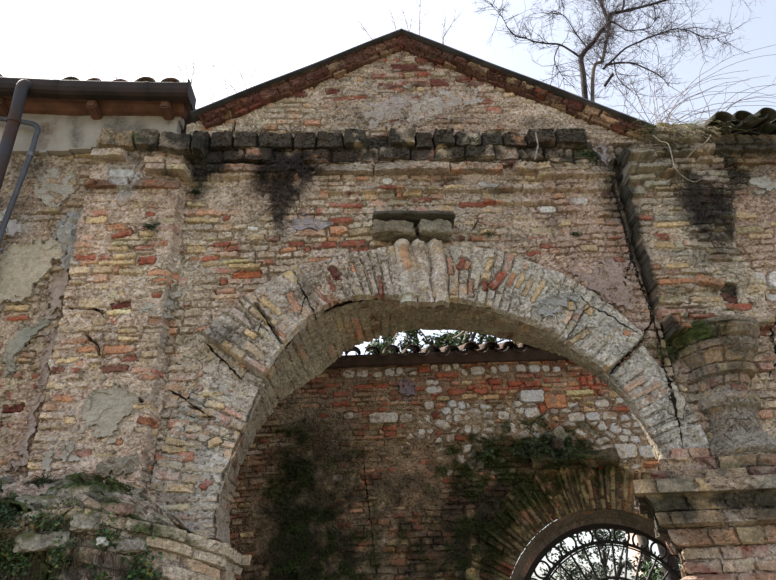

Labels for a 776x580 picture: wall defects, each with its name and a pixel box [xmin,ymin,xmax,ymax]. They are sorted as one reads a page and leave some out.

peeling [32,167,78,219]
damp [254,146,313,223]
peeling [747,176,776,196]
crack [297,281,318,321]
crack [570,167,684,449]
peeling [0,208,71,473]
crack [205,342,244,382]
peeling [41,365,160,472]
crack [168,389,212,418]